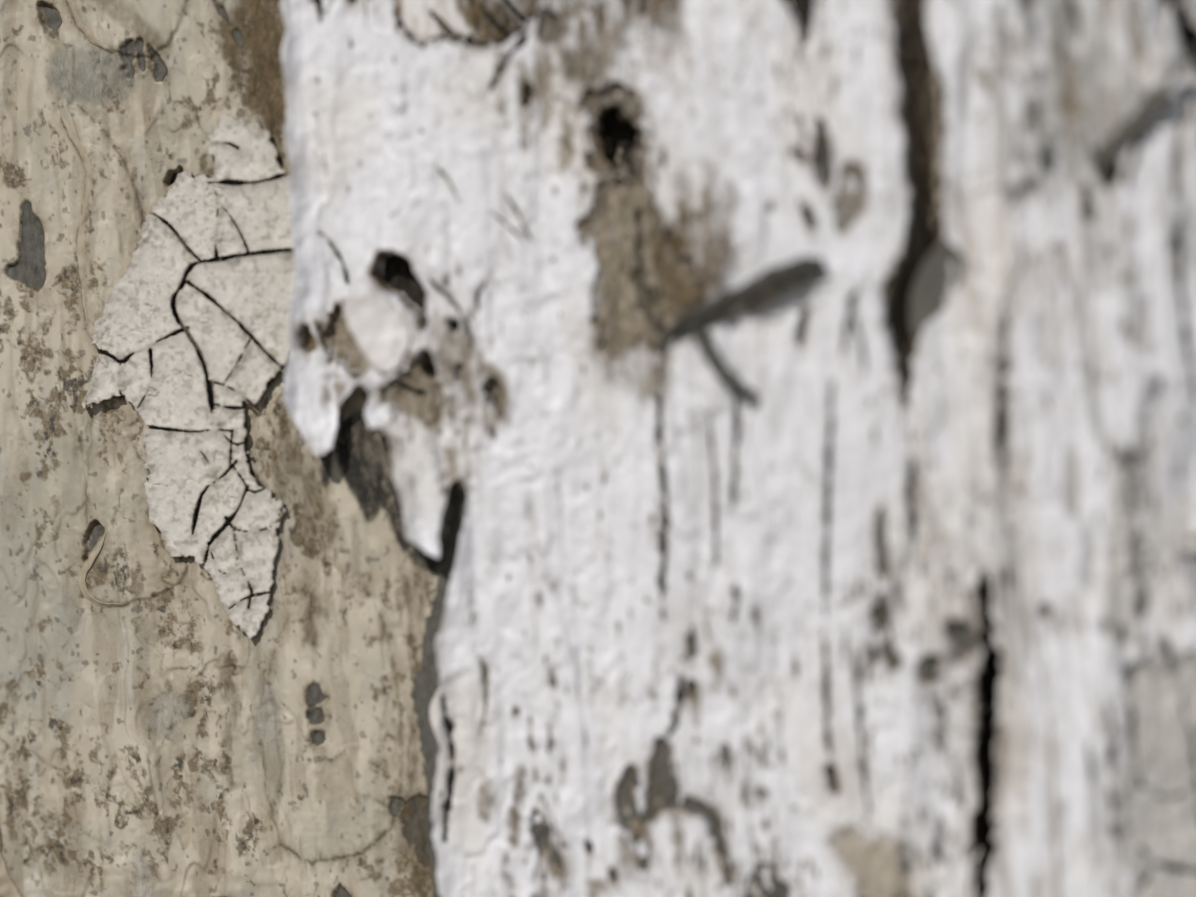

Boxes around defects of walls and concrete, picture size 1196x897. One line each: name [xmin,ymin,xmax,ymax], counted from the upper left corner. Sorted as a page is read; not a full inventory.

crack [396,0,542,91]
crack [637,0,645,17]
peeling [5,201,46,291]
spalling [593,106,829,400]
crack [1170,91,1196,401]
peeling [78,114,296,639]
crack [655,351,669,621]
peeling [306,684,325,745]
peeling [429,687,440,743]
spalling [615,738,733,886]
spalling [746,865,791,897]
crack [1087,704,1196,889]